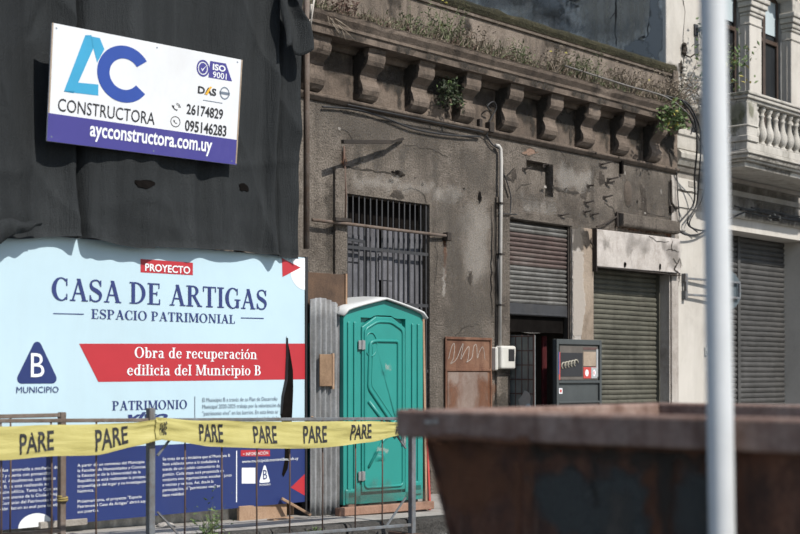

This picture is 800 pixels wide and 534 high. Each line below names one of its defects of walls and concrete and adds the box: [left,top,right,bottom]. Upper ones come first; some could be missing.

crack [609,0,617,46]